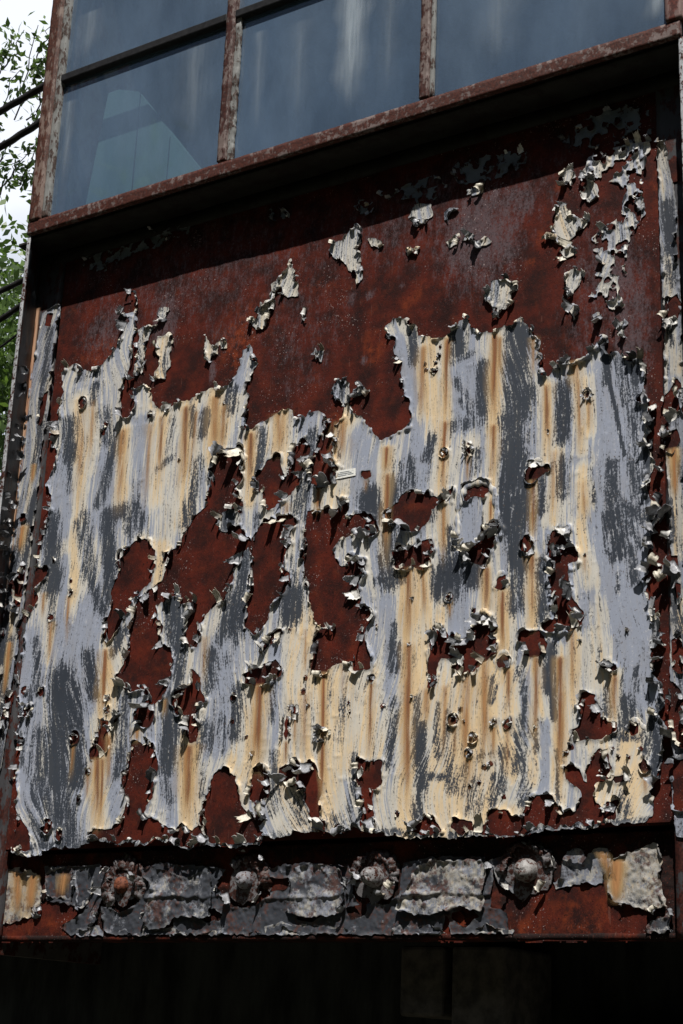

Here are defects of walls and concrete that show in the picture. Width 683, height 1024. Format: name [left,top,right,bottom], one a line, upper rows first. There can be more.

corrosion [421,340,449,390]
corrosion [490,338,501,392]
peeling [0,92,683,834]
corrosion [669,448,679,488]
peeling [0,672,674,943]
corrosion [13,873,36,903]
corrosion [601,854,624,895]